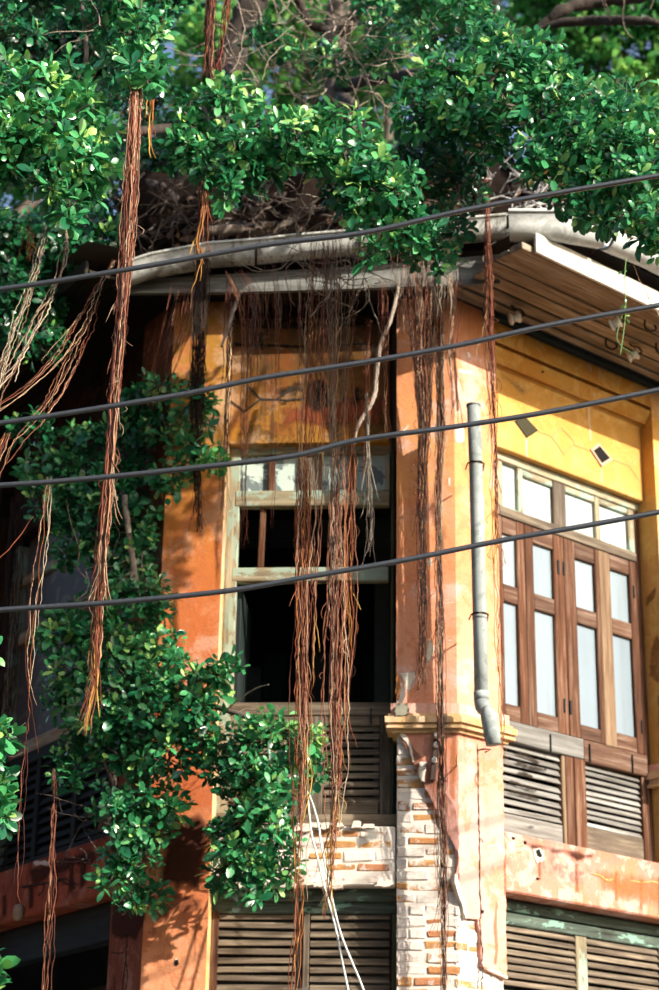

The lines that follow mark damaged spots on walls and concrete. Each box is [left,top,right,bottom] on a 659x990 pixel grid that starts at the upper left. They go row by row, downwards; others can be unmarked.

peeling [283,380,385,425]
spalling [266,733,508,990]
rust [603,873,659,909]